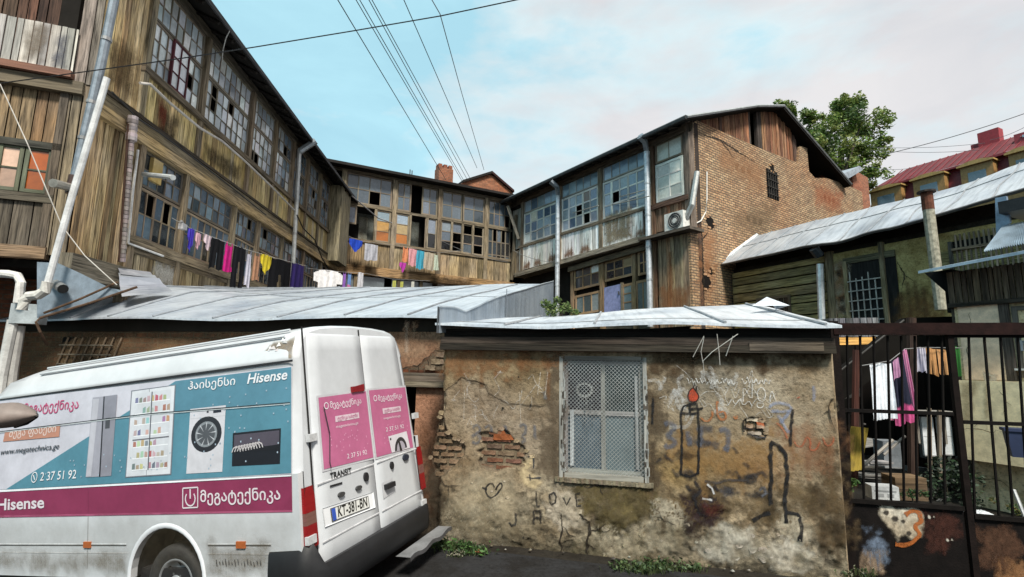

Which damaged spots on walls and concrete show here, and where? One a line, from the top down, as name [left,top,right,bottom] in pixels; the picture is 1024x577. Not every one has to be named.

crack [704,134,754,161]
spalling [411,350,444,371]
crack [442,377,546,406]
spalling [743,417,769,438]
spalling [428,410,465,476]
spalling [479,427,541,488]
rust [865,551,884,574]